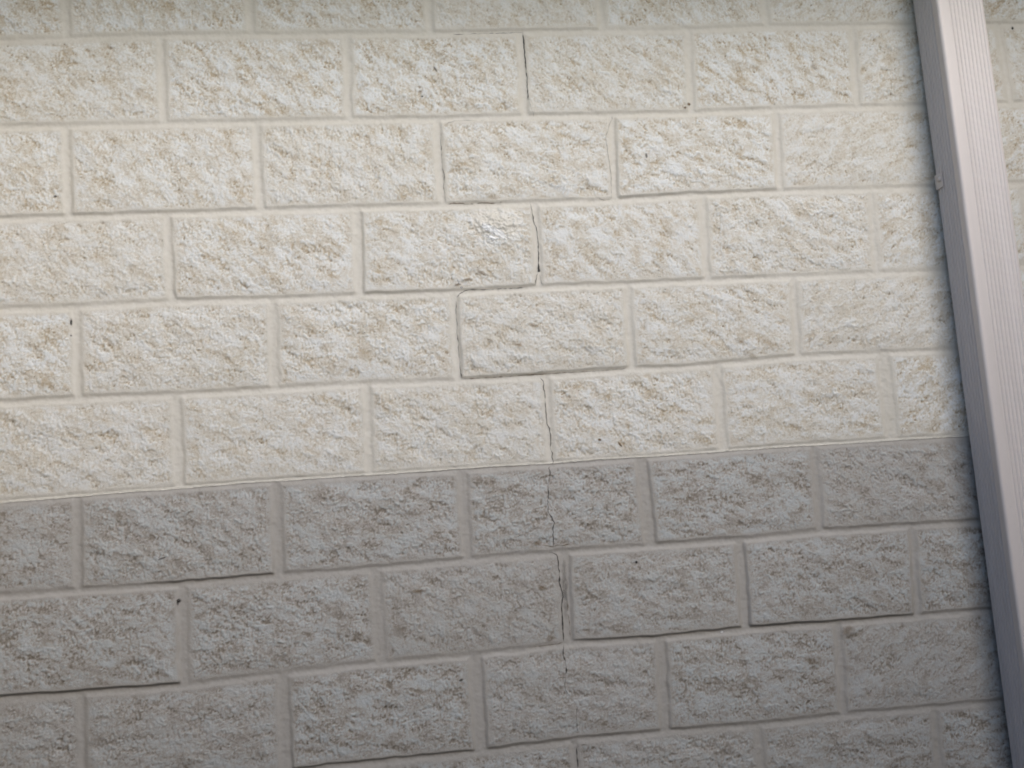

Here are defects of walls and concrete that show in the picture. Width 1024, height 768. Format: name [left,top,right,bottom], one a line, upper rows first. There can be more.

crack [455,32,528,93]
crack [456,208,540,379]
crack [518,368,624,765]